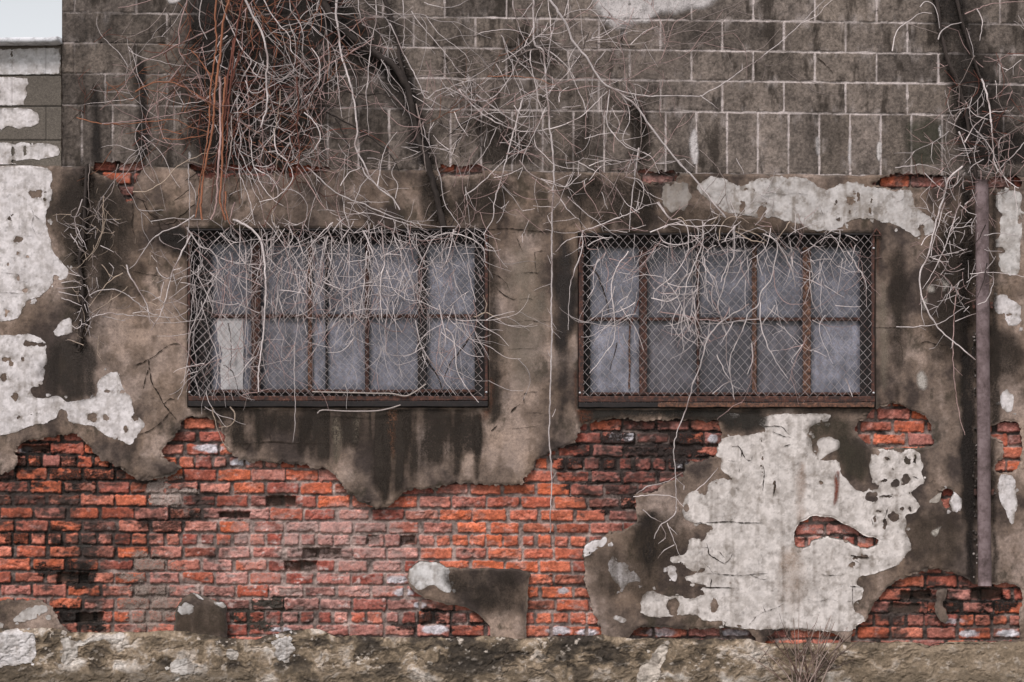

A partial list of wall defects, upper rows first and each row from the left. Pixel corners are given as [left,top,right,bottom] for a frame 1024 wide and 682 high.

peeling [0,48,73,321]
spalling [93,161,145,202]
peeling [638,168,954,239]
water stain [555,235,575,368]
crack [133,343,178,434]
water stain [205,255,500,501]
spalling [0,318,1023,682]